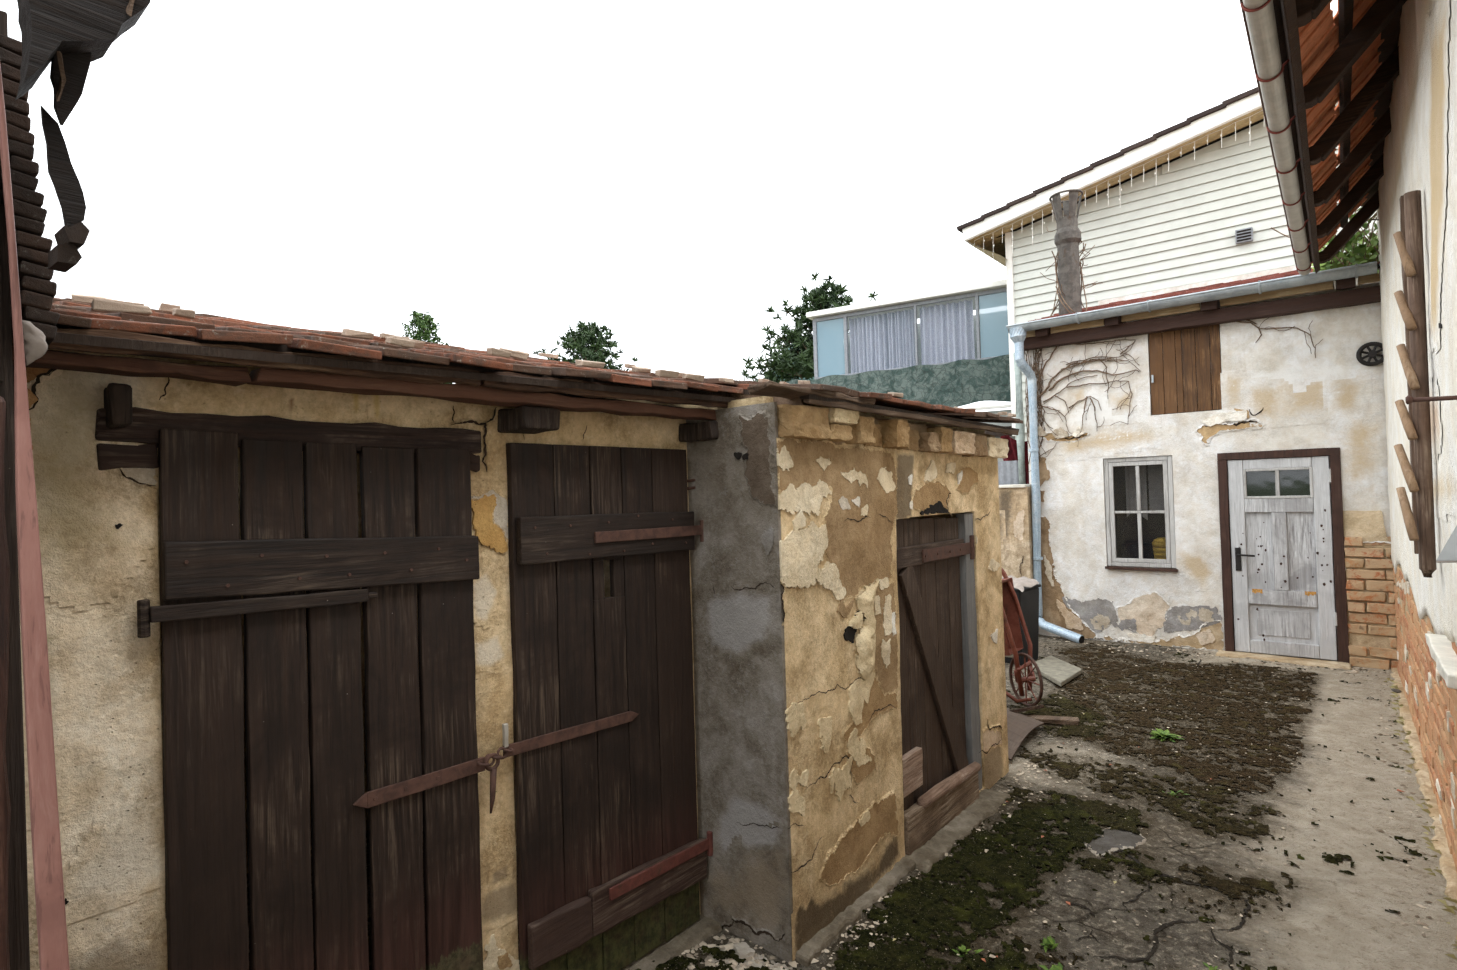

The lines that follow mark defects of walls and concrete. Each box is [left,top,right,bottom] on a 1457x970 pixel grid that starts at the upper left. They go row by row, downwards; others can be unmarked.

spalling [1194,408,1266,447]
peeling [471,487,508,554]
peeling [1013,369,1240,651]
peeling [734,409,979,801]
crack [798,677,897,717]
spalling [979,719,1003,754]
peeling [788,768,809,817]
crack [809,755,858,803]
crack [737,822,822,873]
spalling [819,789,900,887]
crack [1065,849,1251,970]
peeling [483,934,520,970]